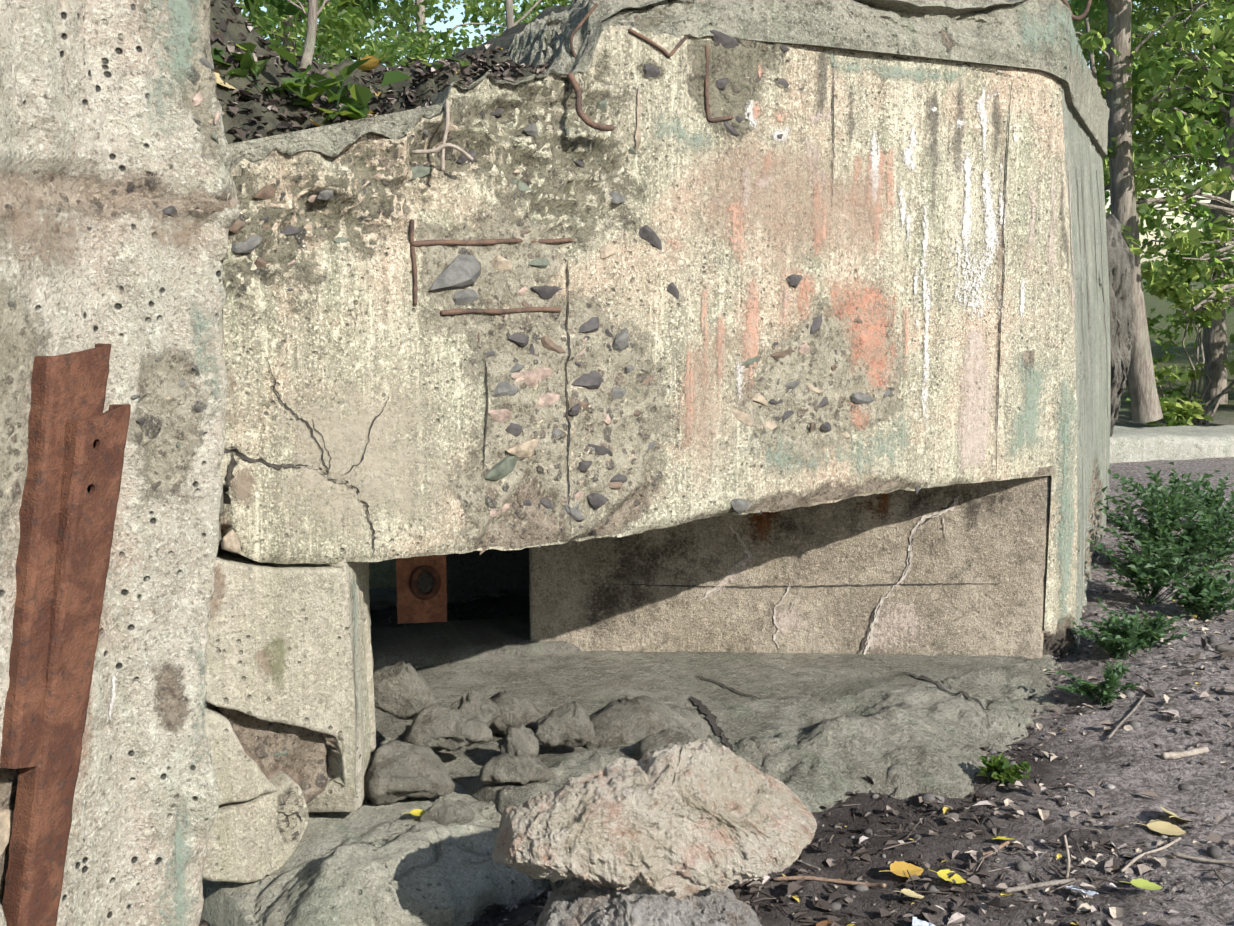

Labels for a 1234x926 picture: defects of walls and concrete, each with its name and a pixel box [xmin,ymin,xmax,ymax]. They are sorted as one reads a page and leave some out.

spalling [621,0,792,139]
spalling [771,127,790,142]
spalling [0,0,676,560]
spalling [667,282,679,299]
crack [223,357,389,554]
crack [858,495,961,654]
crack [902,672,987,710]